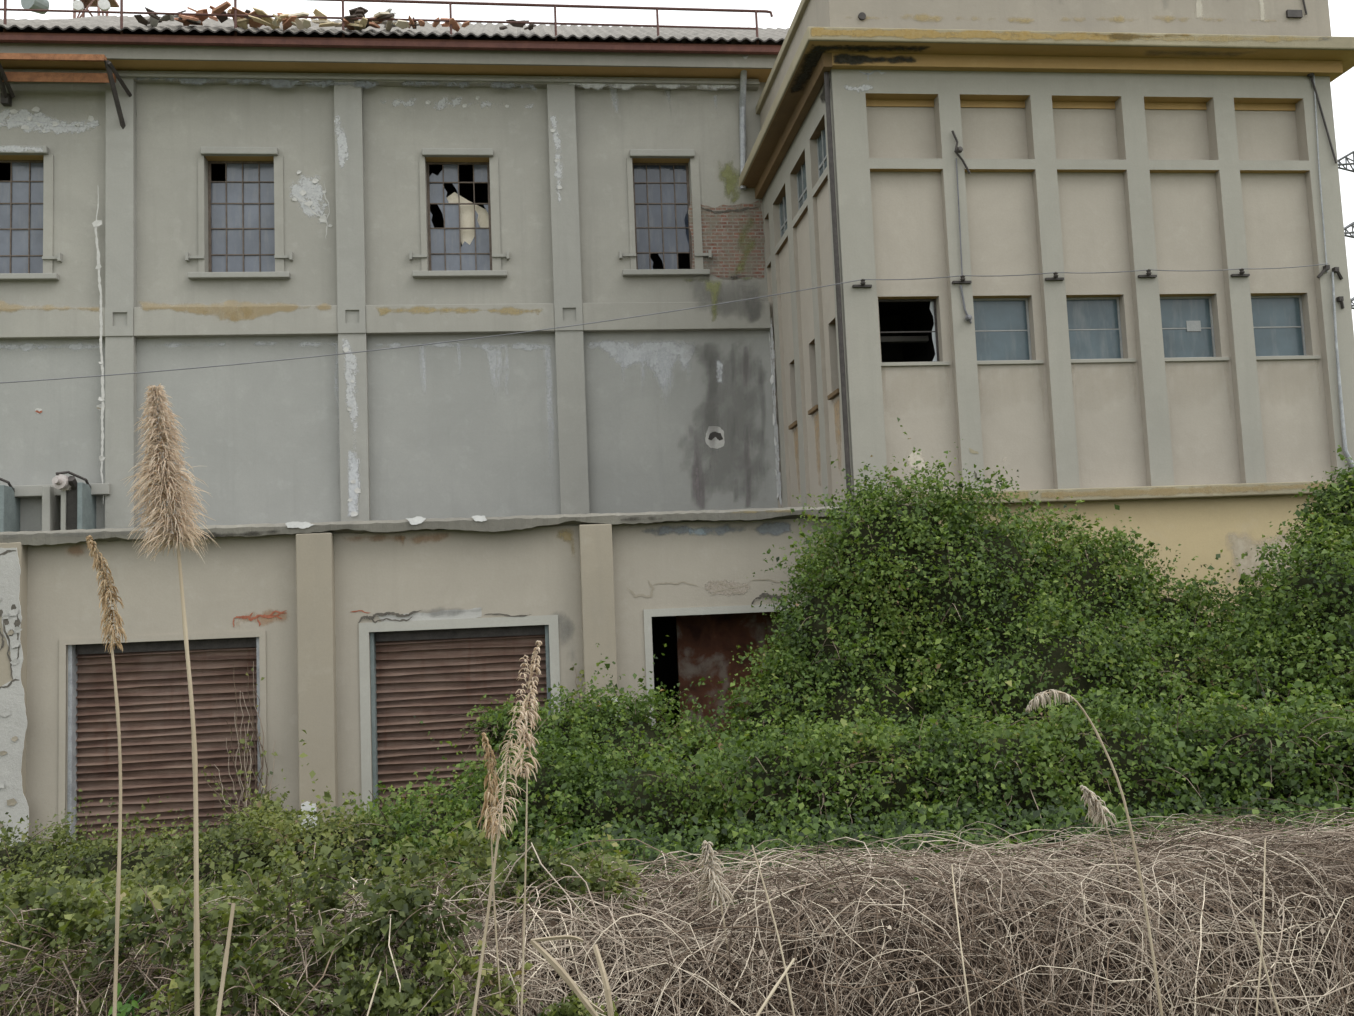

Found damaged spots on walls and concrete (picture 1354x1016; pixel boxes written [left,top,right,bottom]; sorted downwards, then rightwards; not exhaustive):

peeling [290,170,332,238]
flaking render [688,191,765,280]
crack [627,580,698,598]
crack [751,579,788,604]
peeling [0,548,29,849]